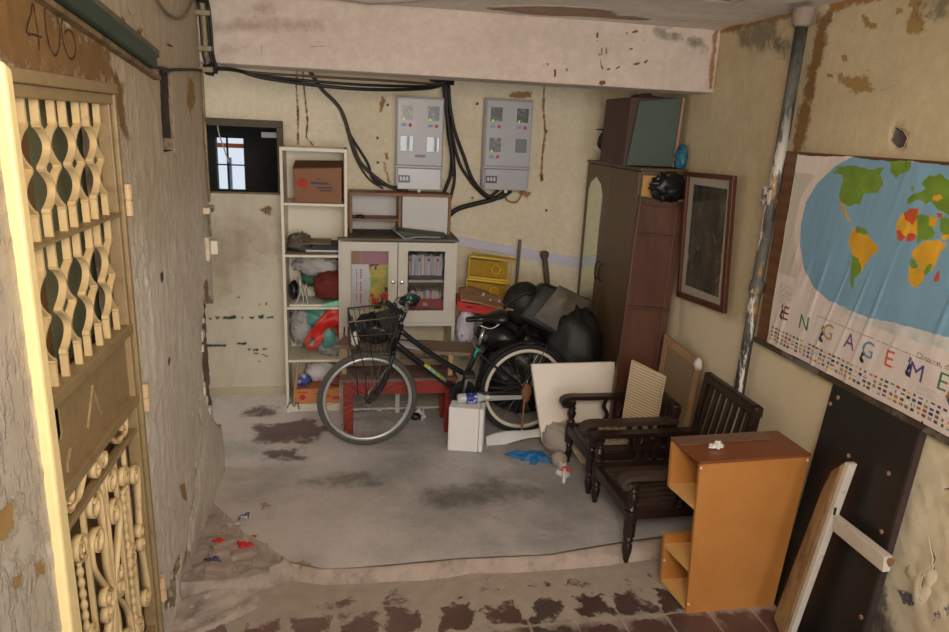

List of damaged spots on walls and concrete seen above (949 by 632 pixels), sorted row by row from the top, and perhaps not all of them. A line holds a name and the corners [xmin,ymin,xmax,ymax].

water stain [828,0,878,14]
water stain [896,0,949,34]
corrosion [709,30,718,89]
peeling [827,55,901,94]
corrosion [540,86,548,181]
spalling [889,126,908,149]
spalling [201,279,214,419]
water stain [245,406,327,459]
peeling [6,511,39,572]
crack [918,537,936,601]